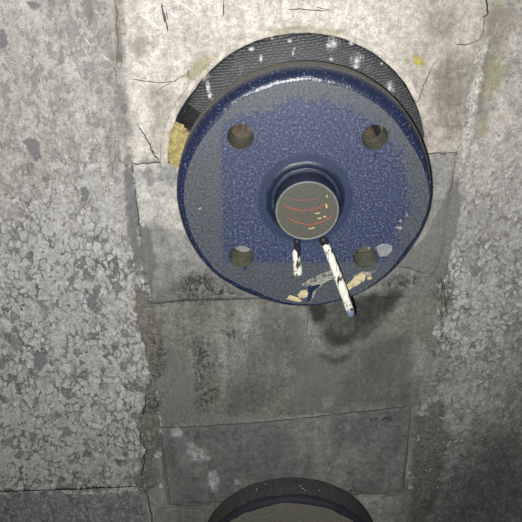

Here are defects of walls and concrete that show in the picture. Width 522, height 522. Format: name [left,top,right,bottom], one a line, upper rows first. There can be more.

crack [456,0,489,50]
crack [131,69,189,92]
peeling [287,270,334,303]
peeling [347,270,376,290]
crack [398,266,447,326]
leakage [311,298,390,343]